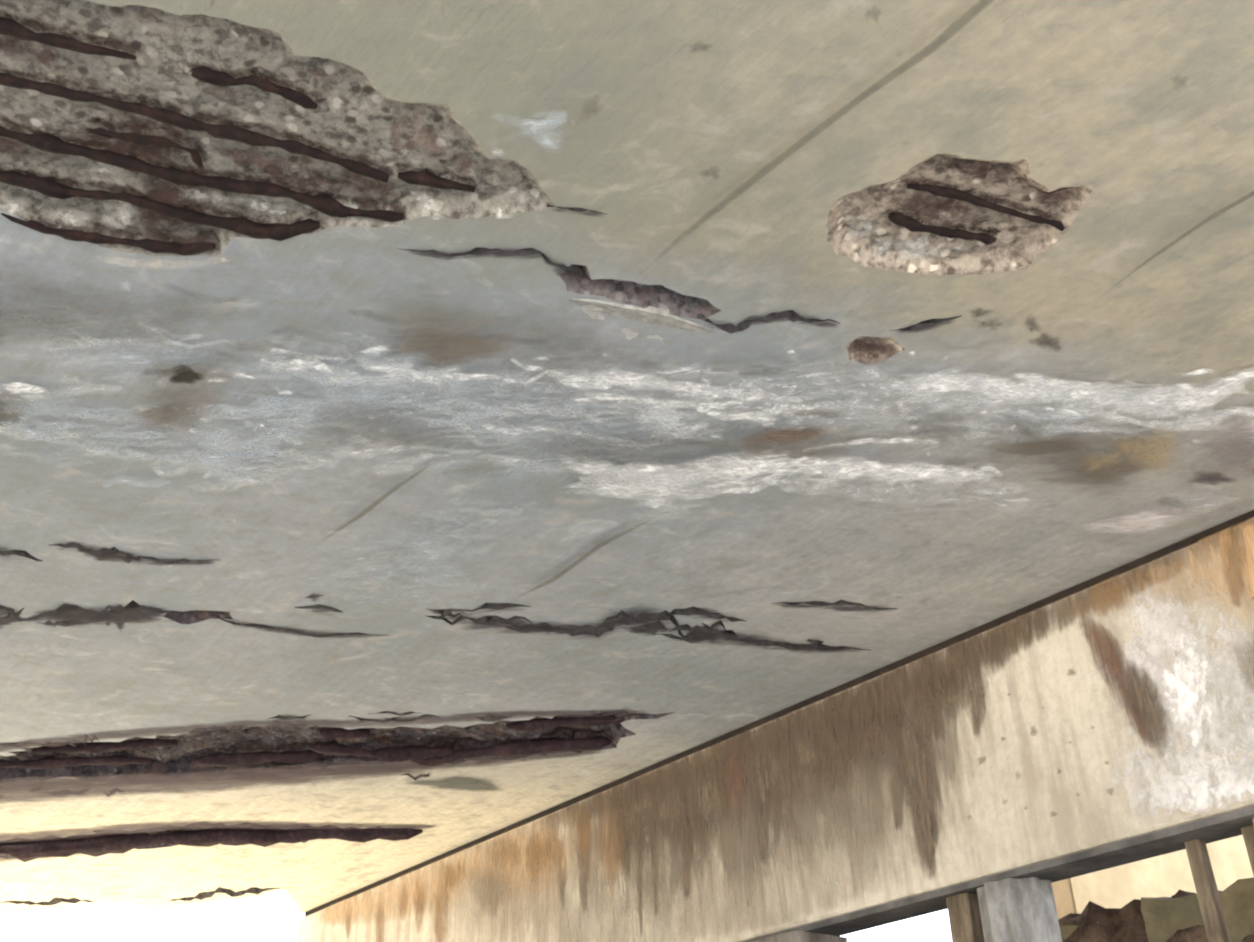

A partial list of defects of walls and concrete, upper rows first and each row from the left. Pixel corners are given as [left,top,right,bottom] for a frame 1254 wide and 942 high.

spalling [0,0,556,256]
spalling [827,154,1093,276]
crack [397,248,841,334]
damp [0,327,1254,512]
crack [0,542,213,565]
damp [1094,495,1220,532]
crack [0,594,390,638]
crack [427,603,867,653]
damp [1100,595,1254,811]
spalling [0,710,674,801]
spalling [0,821,432,862]
damp [325,664,985,942]